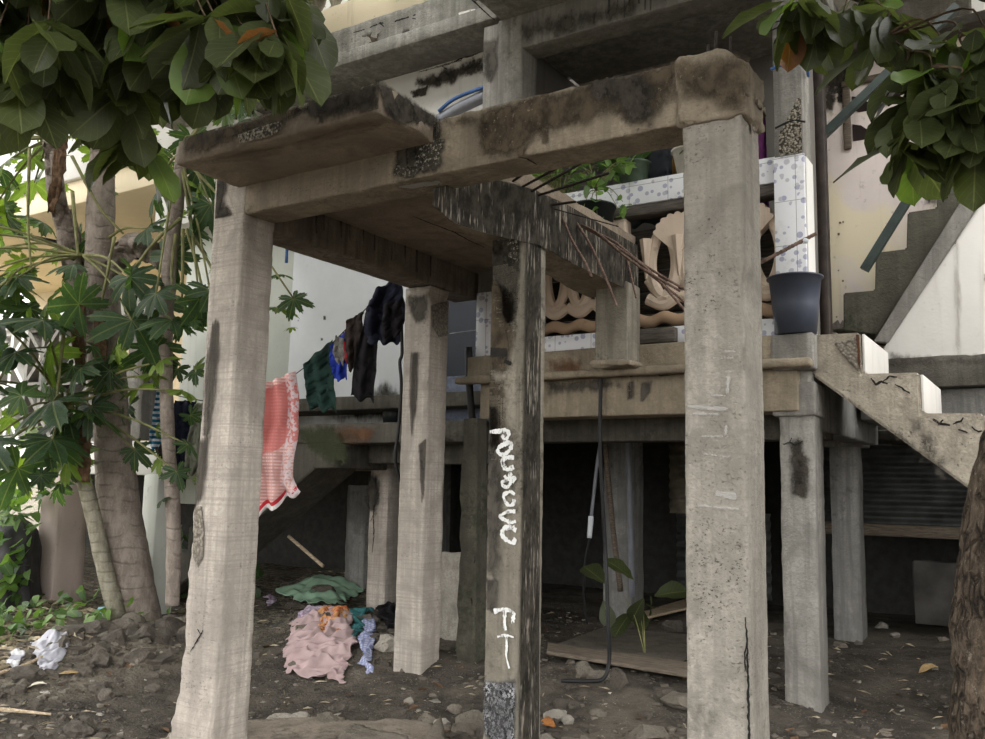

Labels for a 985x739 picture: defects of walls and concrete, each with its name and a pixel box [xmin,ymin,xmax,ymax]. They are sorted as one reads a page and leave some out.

leakage [458,55,750,156]
spalling [779,97,802,156]
leakage [183,40,650,739]
leakage [689,371,732,415]
crack [870,375,910,394]
crack [933,418,982,433]
leakage [790,439,809,498]
crack [743,617,751,739]